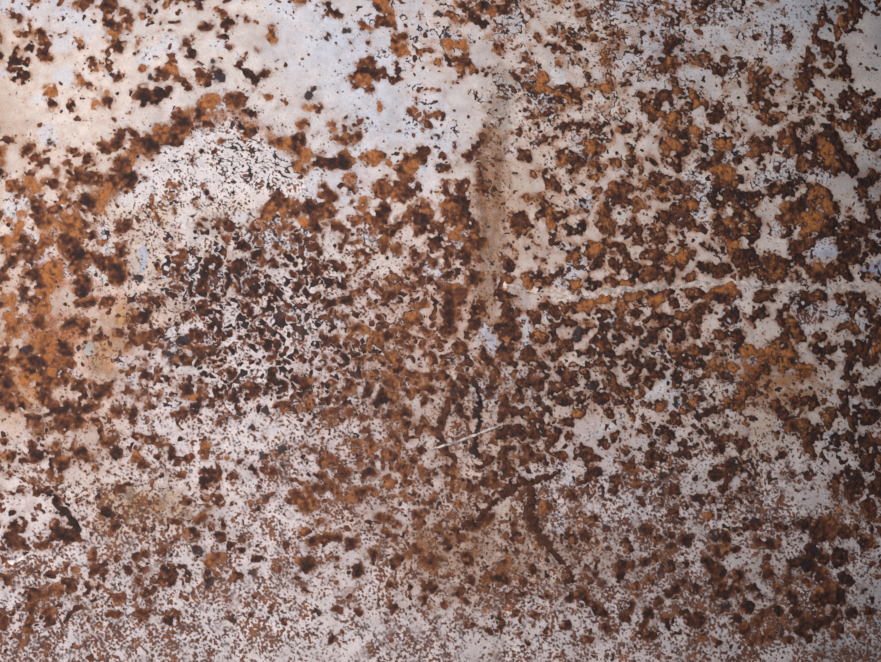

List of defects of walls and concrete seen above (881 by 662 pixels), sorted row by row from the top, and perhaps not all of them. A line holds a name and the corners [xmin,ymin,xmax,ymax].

rust [0,8,54,94]
rust [42,64,113,121]
rust [58,0,204,82]
rust [131,35,225,108]
rust [197,0,235,50]
rust [234,54,273,101]
rust [266,23,279,44]
rust [290,0,351,41]
rust [338,0,434,94]
rust [406,97,449,140]
rust [271,273,341,379]
rust [364,490,417,529]